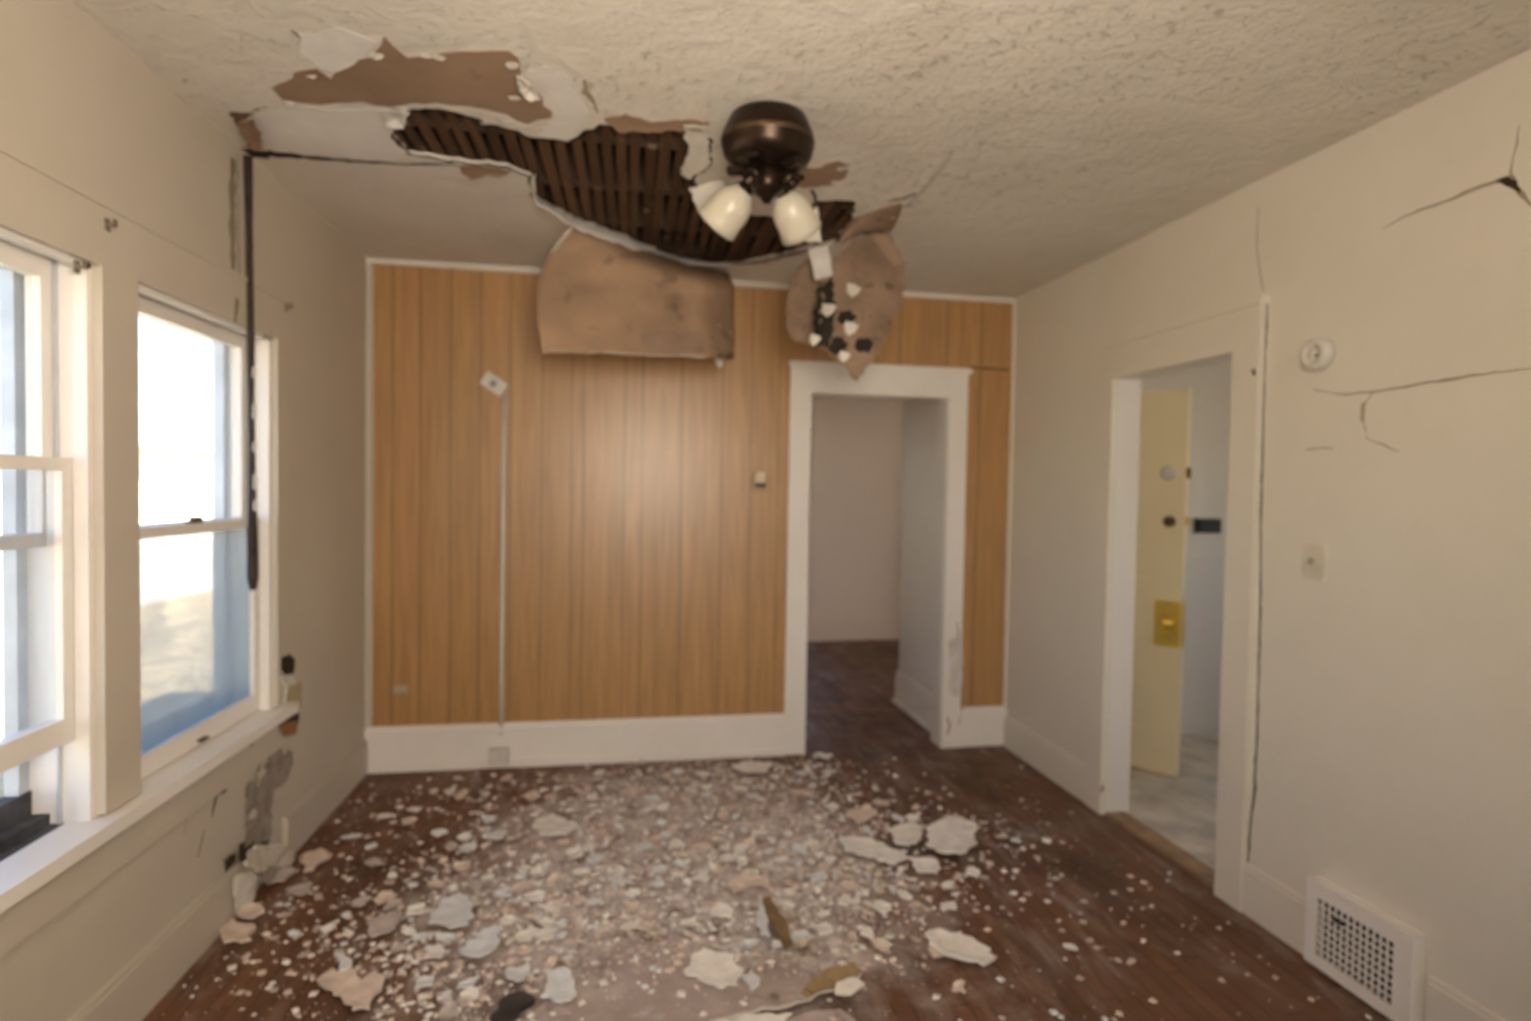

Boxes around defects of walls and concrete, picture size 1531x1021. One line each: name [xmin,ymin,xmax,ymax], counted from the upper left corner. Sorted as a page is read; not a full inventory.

peeling [248,27,599,160]
peeling [797,161,857,190]
crack [1384,125,1531,228]
crack [1306,368,1531,452]
spalling [224,654,313,915]